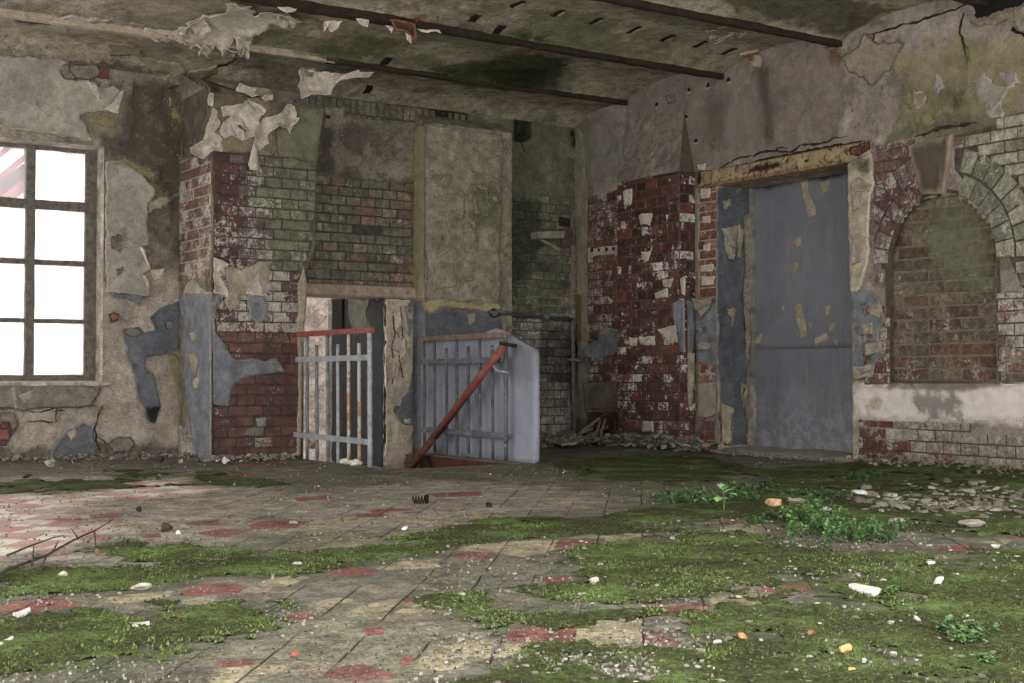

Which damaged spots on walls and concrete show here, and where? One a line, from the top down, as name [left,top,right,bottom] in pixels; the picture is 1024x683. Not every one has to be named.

peeling [144,3,302,59]
peeling [324,20,342,32]
crack [869,4,971,70]
peeling [177,67,374,172]
crack [719,136,847,168]
rust [695,140,871,188]
flaking render [973,71,1023,118]
peeling [104,161,180,306]
peeling [575,127,885,446]
peeling [122,258,285,459]
crack [383,299,407,468]